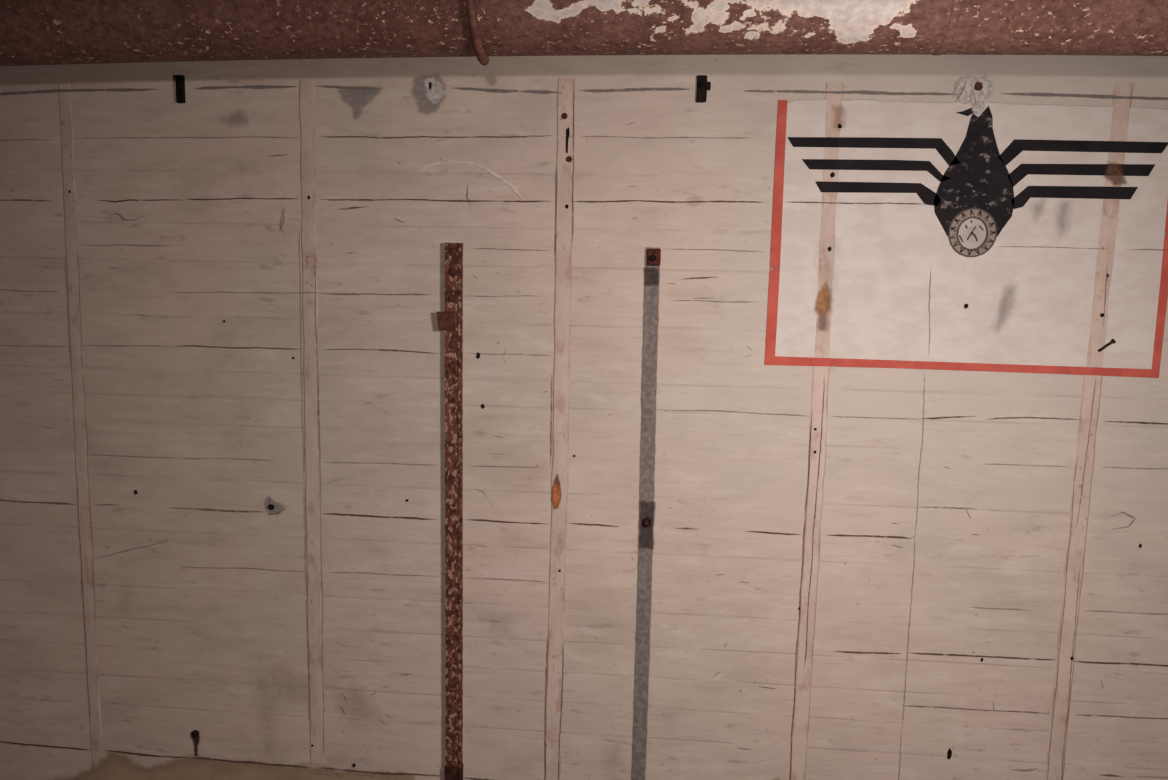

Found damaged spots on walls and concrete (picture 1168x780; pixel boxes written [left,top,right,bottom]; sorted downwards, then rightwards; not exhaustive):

peeling [525,0,626,23]
peeling [714,0,919,44]
water stain [69,753,413,780]